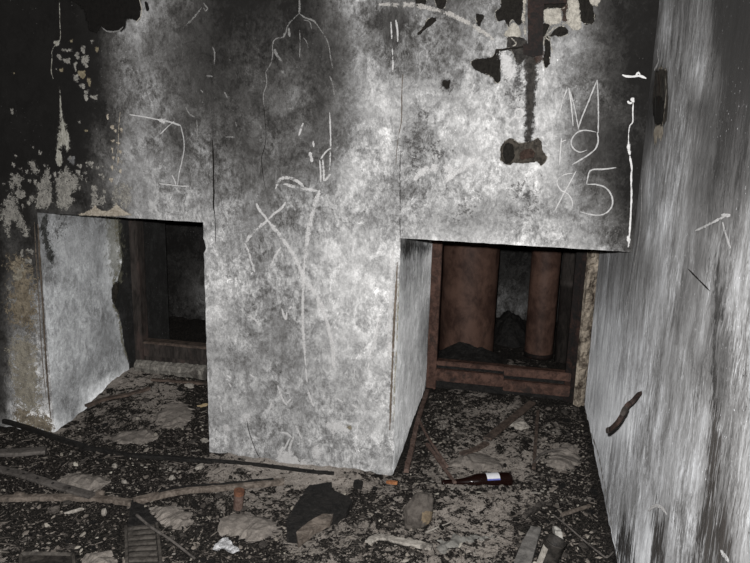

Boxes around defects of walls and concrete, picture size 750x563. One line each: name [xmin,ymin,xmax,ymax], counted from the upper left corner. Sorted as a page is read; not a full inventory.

peeling [0,114,132,359]
flaking render [56,0,149,101]
crack [209,111,217,243]
crack [395,75,403,236]
flaking render [471,0,600,83]
spalling [652,50,668,147]